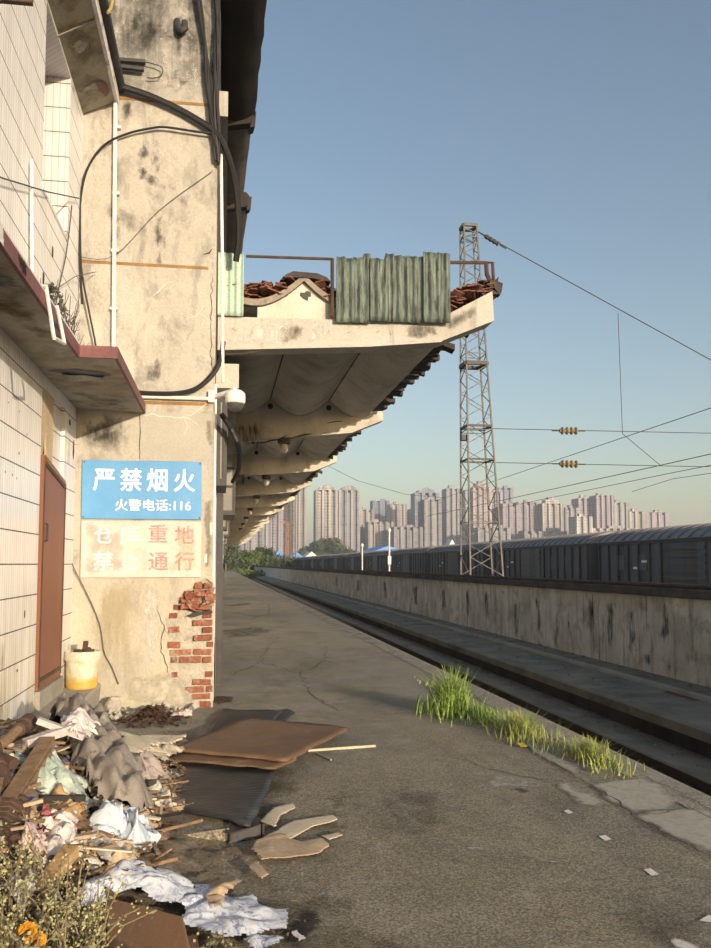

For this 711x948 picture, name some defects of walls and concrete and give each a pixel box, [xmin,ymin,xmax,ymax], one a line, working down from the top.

leakage [133,14,156,41]
leakage [90,426,118,444]
spalling [130,578,216,708]
crack [452,735,711,857]